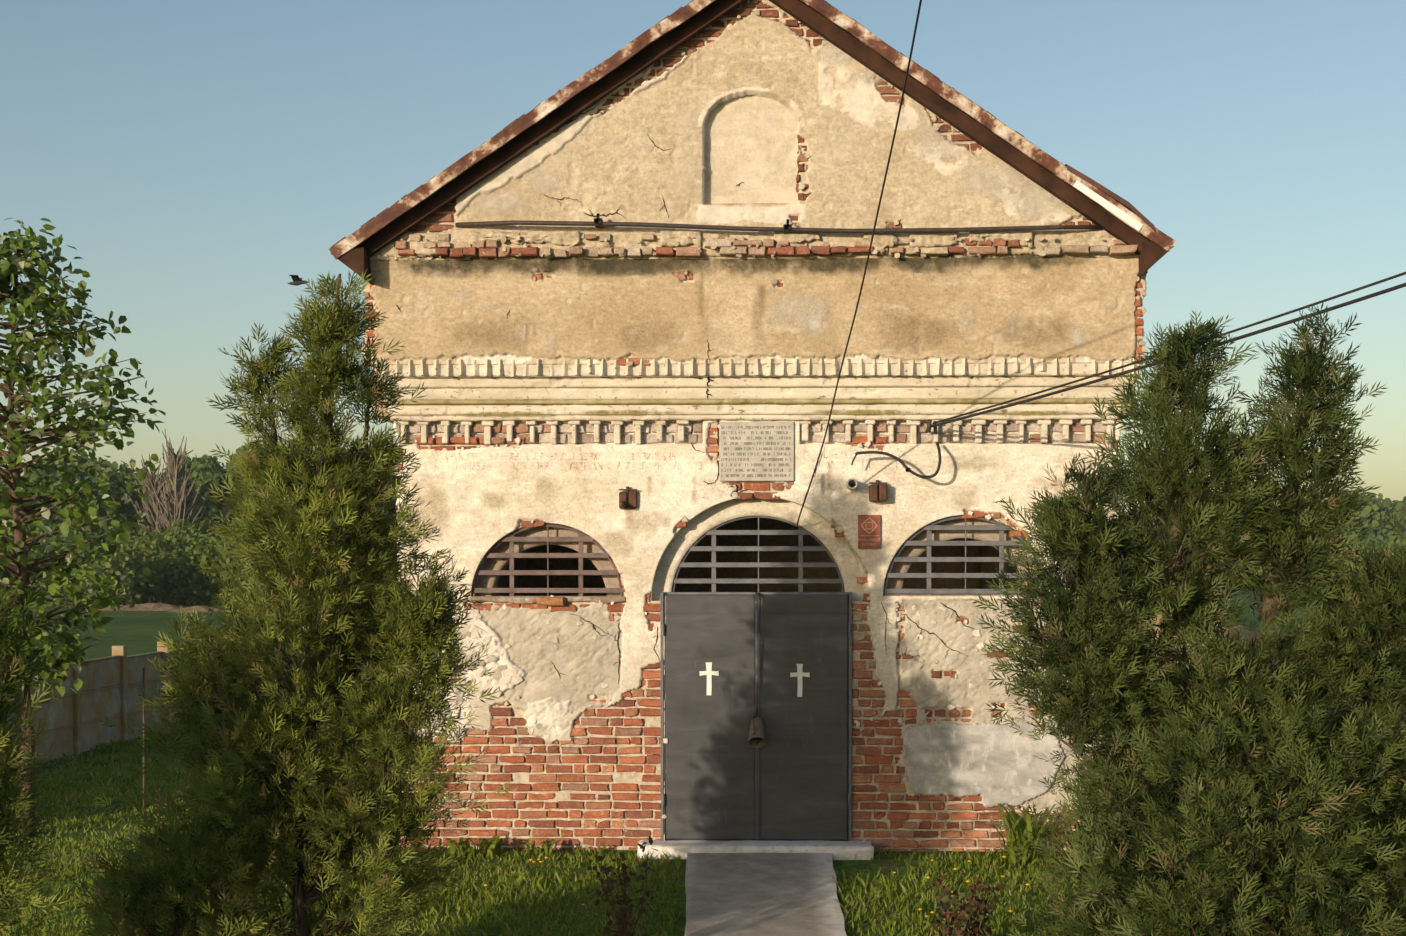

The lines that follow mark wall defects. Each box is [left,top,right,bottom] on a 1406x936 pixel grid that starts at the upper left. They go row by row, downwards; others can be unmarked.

spalling [591,0,828,116]
spalling [789,135,811,227]
spalling [1131,276,1147,364]
spalling [398,437,525,470]
spalling [706,425,719,461]
spalling [847,436,887,450]
spalling [399,567,668,850]
spalling [852,568,1093,852]